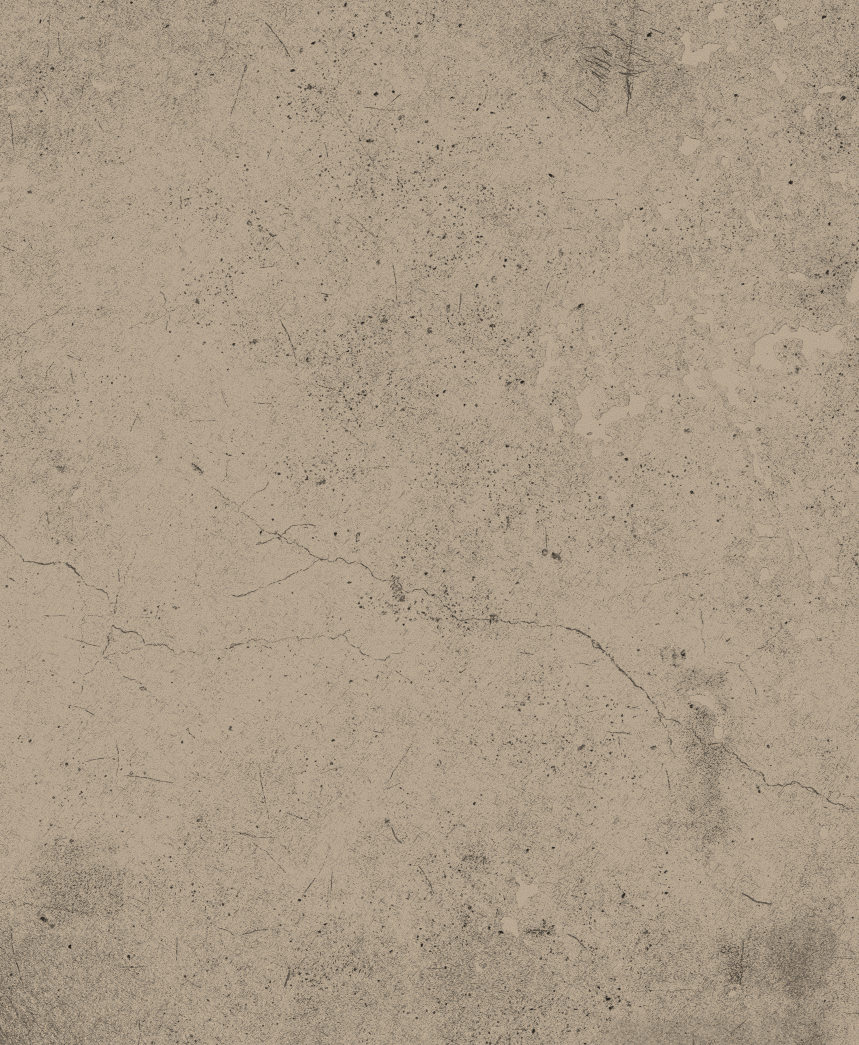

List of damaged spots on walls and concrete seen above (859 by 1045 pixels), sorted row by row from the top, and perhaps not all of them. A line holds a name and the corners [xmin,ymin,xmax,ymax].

peeling [568,379,653,461]
crack [0,534,400,705]
crack [214,475,859,809]